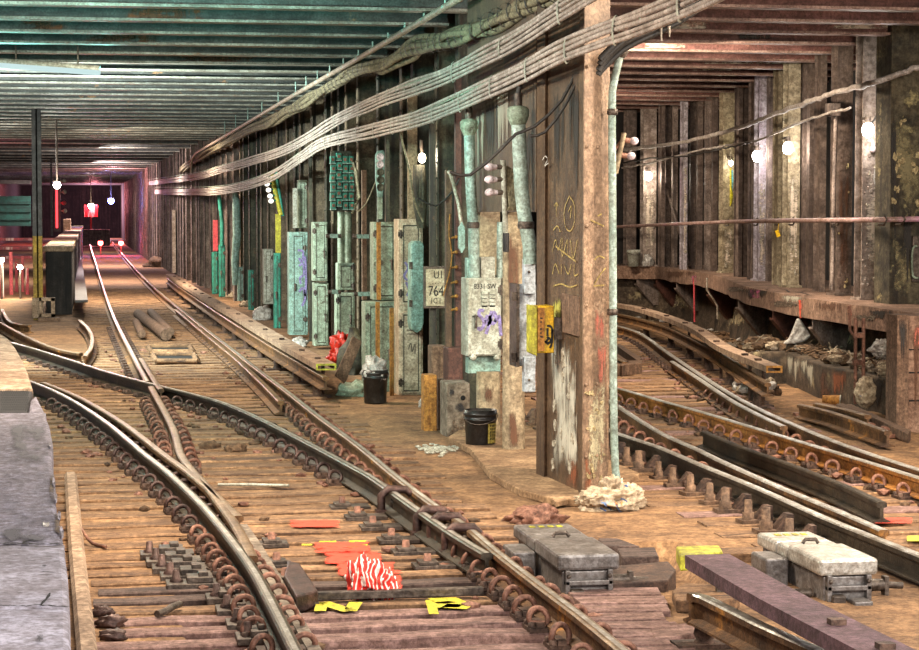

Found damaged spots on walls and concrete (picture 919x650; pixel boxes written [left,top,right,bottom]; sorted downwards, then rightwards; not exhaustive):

leakage [891,118,911,288]
peeling [551,341,606,480]